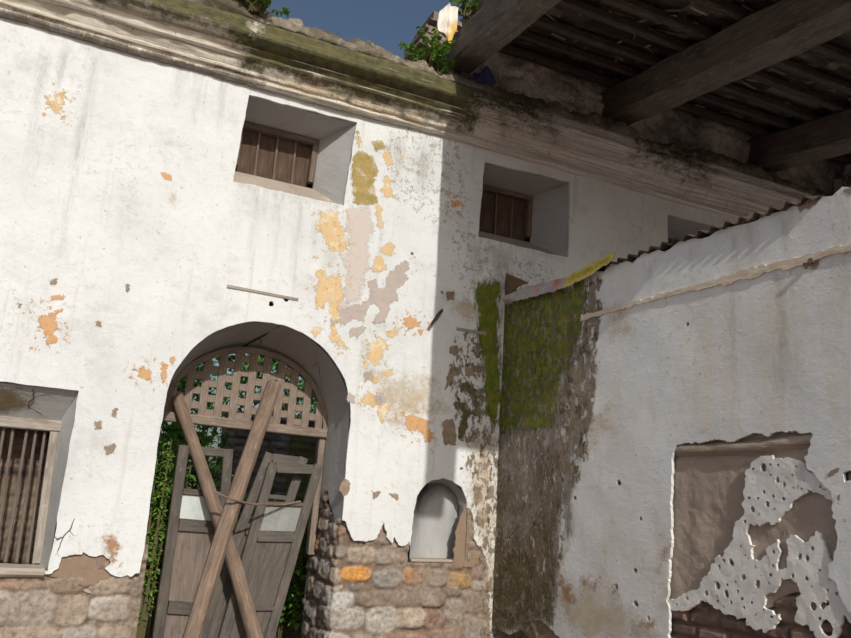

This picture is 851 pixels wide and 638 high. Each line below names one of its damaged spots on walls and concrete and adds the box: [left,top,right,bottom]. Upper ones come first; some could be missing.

flaking render [42,82,78,124]
damp [0,0,558,133]
flaking render [795,196,818,212]
peeling [18,278,70,353]
peeling [126,356,176,391]
flaking render [300,128,603,638]
damp [492,287,581,633]
crack [54,518,75,553]
flaking render [669,431,851,638]
flaking render [0,536,149,638]